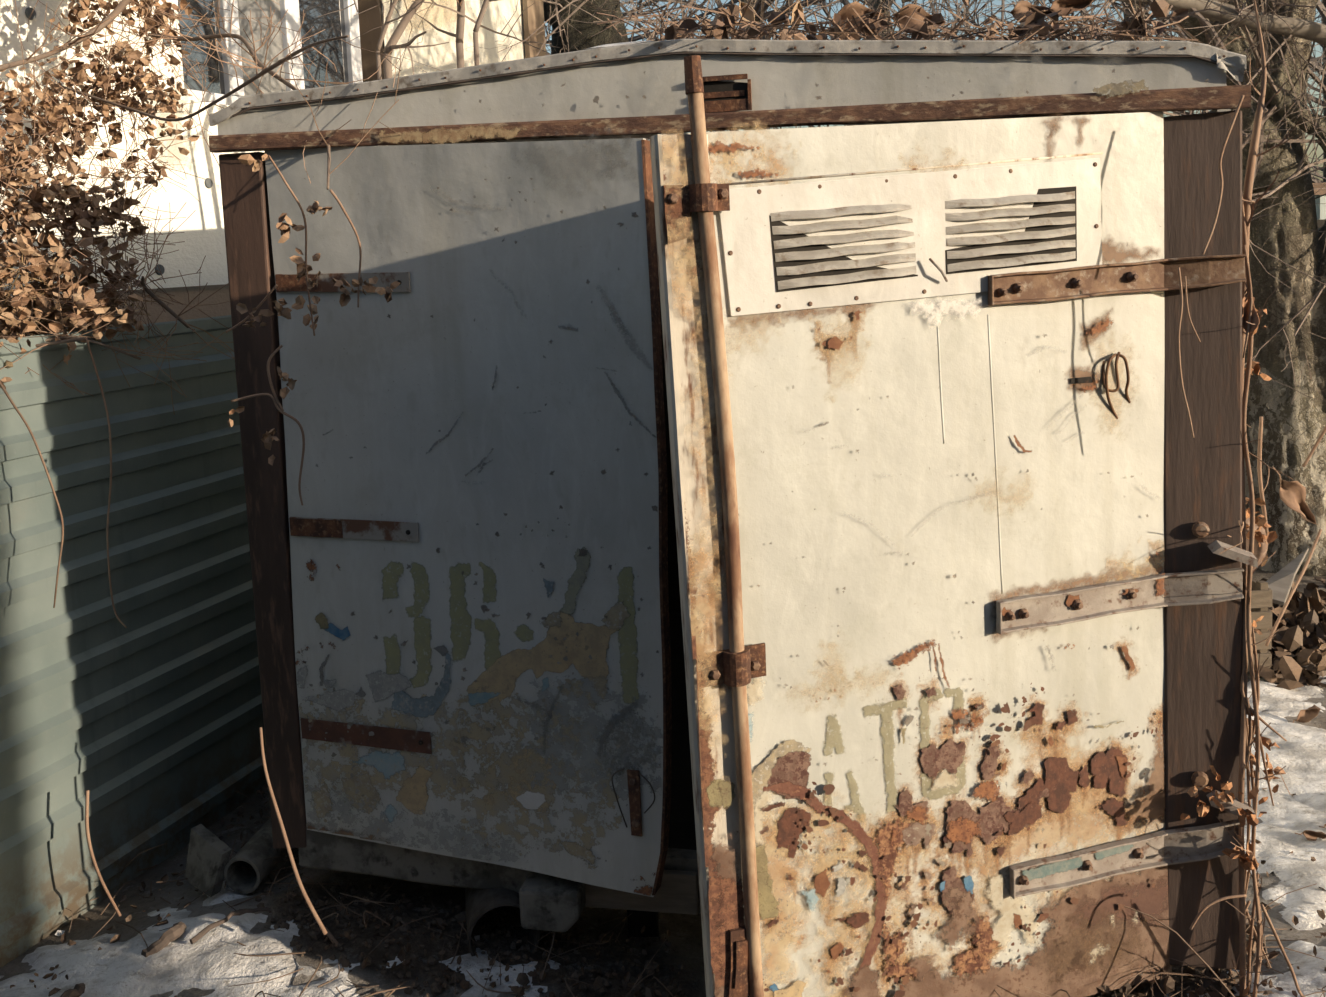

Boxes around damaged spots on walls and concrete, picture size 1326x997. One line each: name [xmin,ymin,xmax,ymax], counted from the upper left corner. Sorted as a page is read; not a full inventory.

rust [708,140,787,184]
rust [661,130,704,325]
rust [733,303,871,367]
peeling [315,612,355,640]
peeling [392,546,643,724]
peeling [312,750,433,822]
rust [685,508,1172,997]